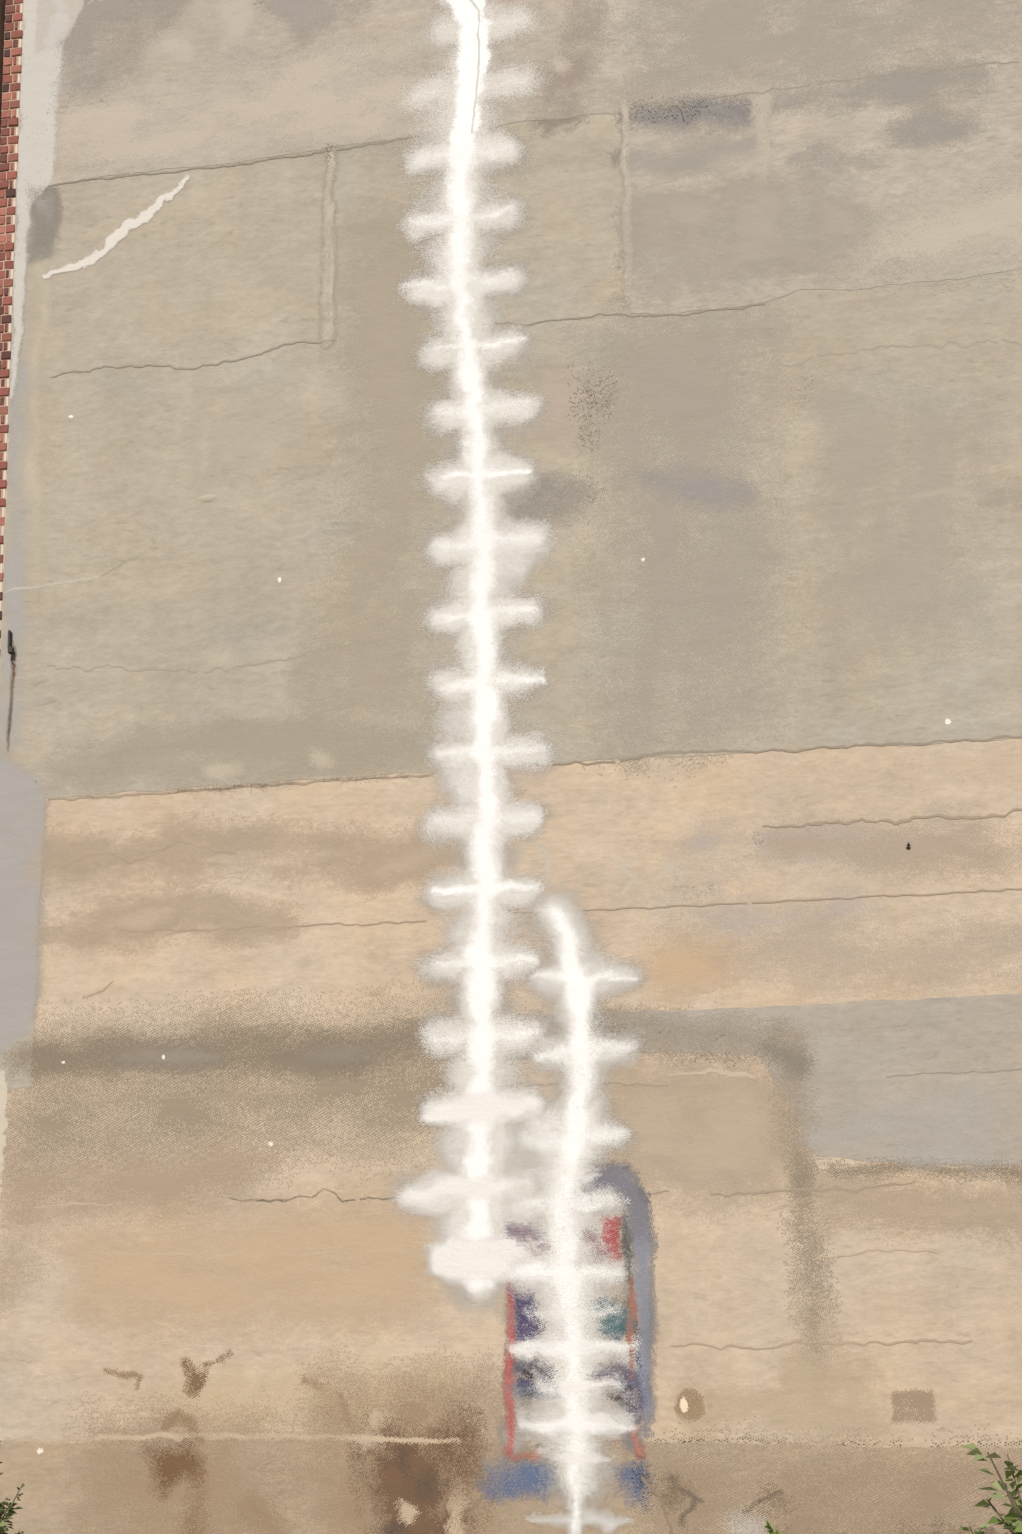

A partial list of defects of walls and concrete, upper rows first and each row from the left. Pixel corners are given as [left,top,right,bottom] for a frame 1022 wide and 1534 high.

crack [469,0,480,133]
crack [484,302,765,326]
crack [763,808,1022,828]
leakage [0,189,560,1534]
crack [500,888,1022,914]
crack [496,1068,756,1087]